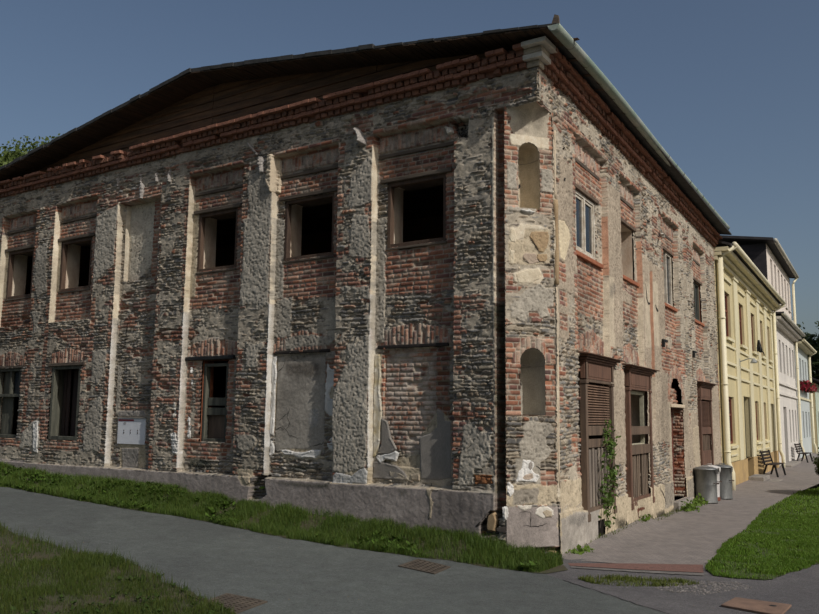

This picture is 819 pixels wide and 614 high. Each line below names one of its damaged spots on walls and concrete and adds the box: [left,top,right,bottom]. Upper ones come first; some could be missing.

peeling [269,356,334,459]
peeling [497,459,554,533]